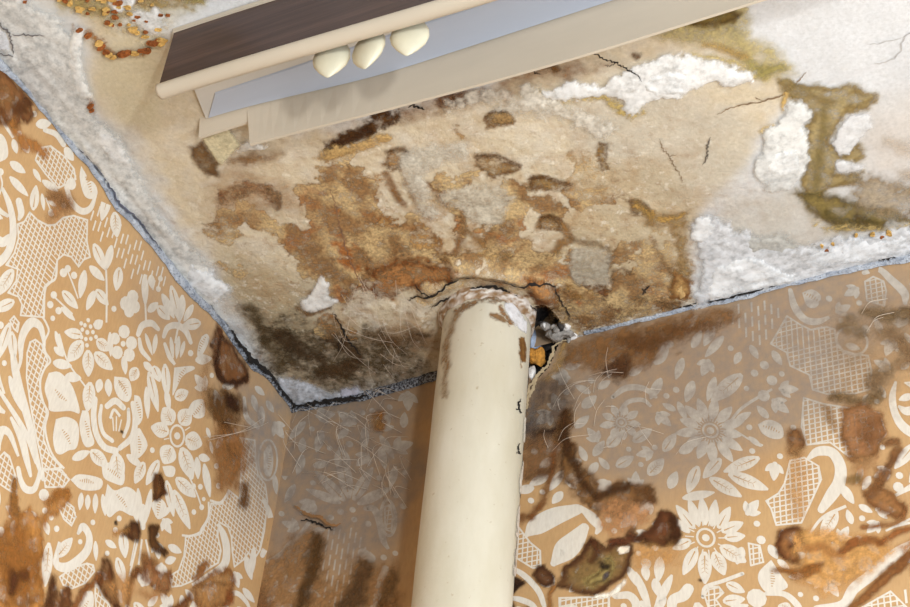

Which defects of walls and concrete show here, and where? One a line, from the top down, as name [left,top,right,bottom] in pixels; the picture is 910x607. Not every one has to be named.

rust [57,0,170,60]
crack [870,33,910,64]
peeling [445,53,755,138]
peeling [755,101,812,193]
water stain [662,7,910,239]
peeling [832,114,872,173]
crack [407,278,570,321]
peeling [691,215,910,309]
water stain [202,110,733,607]
water stain [153,473,167,501]
water stain [775,307,910,607]
water stain [0,478,172,607]